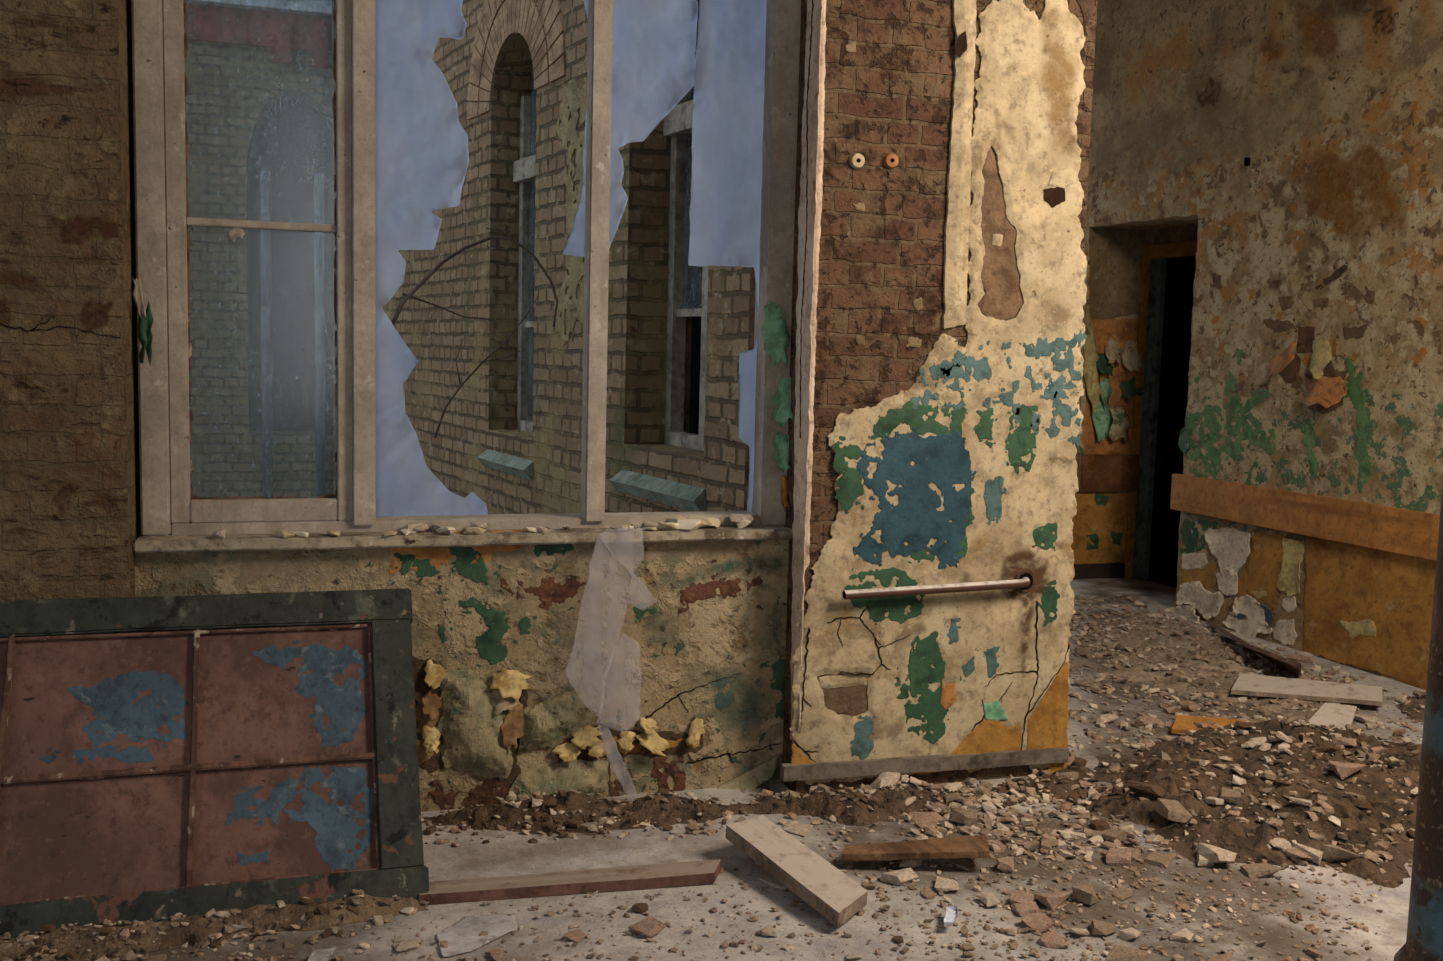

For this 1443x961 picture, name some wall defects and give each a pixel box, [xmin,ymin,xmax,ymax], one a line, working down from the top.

flaking render [977,147,1023,320]
peeling [1185,280,1375,486]
peeling [831,303,1144,626]
flaking render [413,656,521,810]
peeling [389,529,586,673]
flaking render [552,719,706,797]
flaking render [678,573,762,613]
flaking render [817,671,876,760]
peeling [895,618,1000,744]
peeling [951,662,1069,777]
crack [971,601,1070,750]
peeling [1165,519,1436,690]